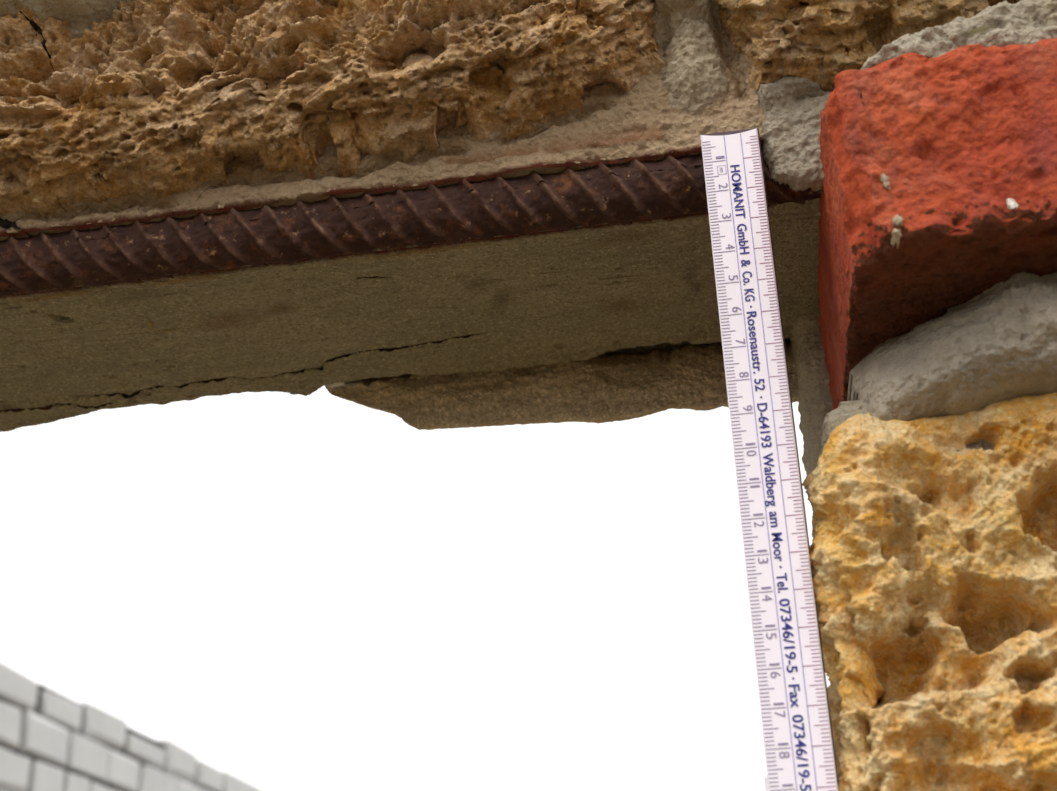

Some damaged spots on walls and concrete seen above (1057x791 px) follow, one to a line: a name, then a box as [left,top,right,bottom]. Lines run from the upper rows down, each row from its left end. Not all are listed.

crack [19,11,55,72]
rust [322,146,702,197]
rust [0,201,278,237]
rust [266,212,709,265]
crack [0,333,482,413]